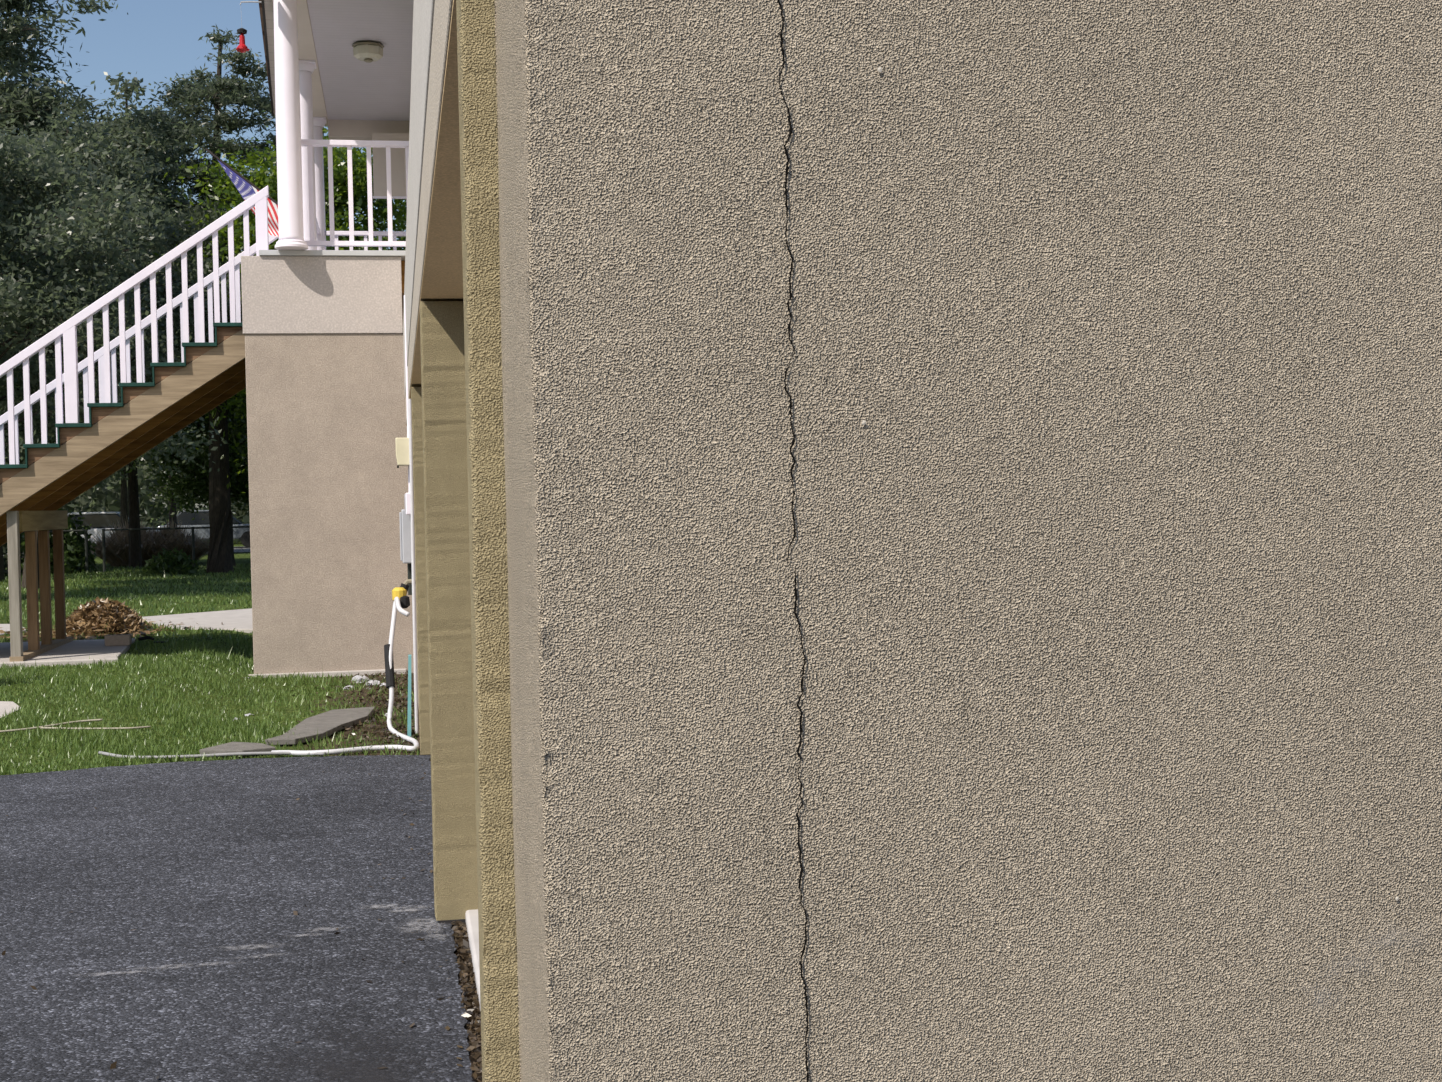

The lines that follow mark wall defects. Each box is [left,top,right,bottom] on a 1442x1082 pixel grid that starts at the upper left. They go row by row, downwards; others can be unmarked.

crack [777,0,809,1082]